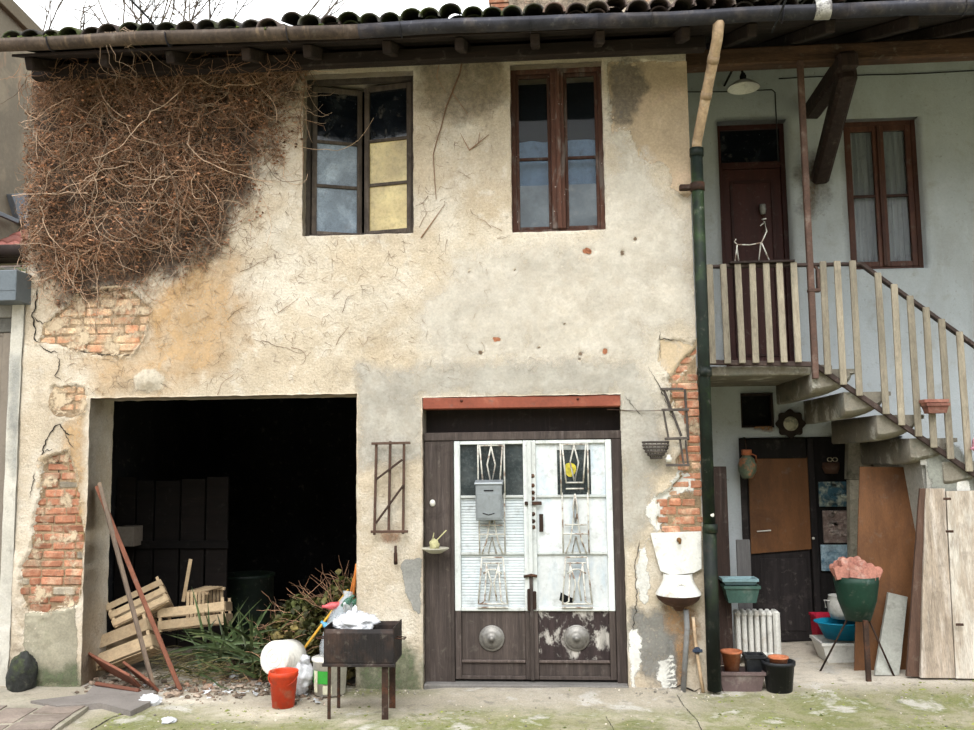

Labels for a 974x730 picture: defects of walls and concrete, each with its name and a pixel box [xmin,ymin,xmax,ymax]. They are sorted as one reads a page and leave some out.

leakage [611,62,648,122]
crack [31,288,132,380]
flaking render [35,285,153,358]
flaking render [48,385,87,417]
crack [29,424,72,498]
flaking render [636,338,703,604]
peeling [927,445,974,491]
flaking render [20,446,84,613]
peeling [629,629,642,687]
peeling [656,655,677,689]